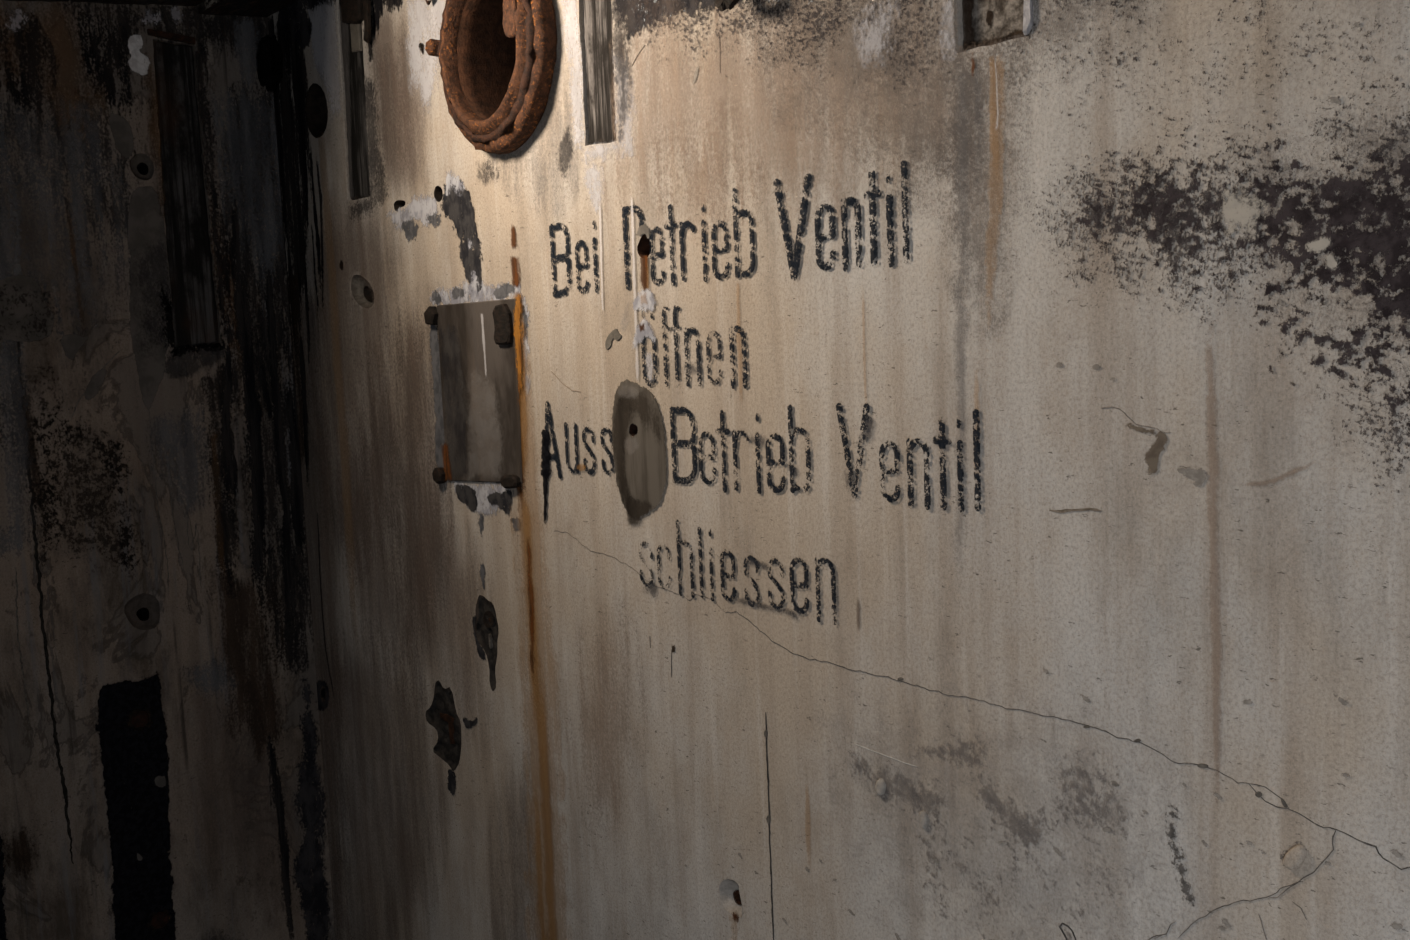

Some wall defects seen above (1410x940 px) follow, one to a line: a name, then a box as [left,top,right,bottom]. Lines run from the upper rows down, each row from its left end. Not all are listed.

leakage [751,0,953,108]
crack [15,342,74,864]
leakage [212,87,470,940]
peeling [429,325,445,468]
spalling [425,680,478,795]
peeling [402,171,530,401]
spalling [472,564,498,691]
peeling [454,481,523,537]
corrosion [510,225,556,940]
crack [556,530,1410,940]
leakage [1009,0,1410,494]